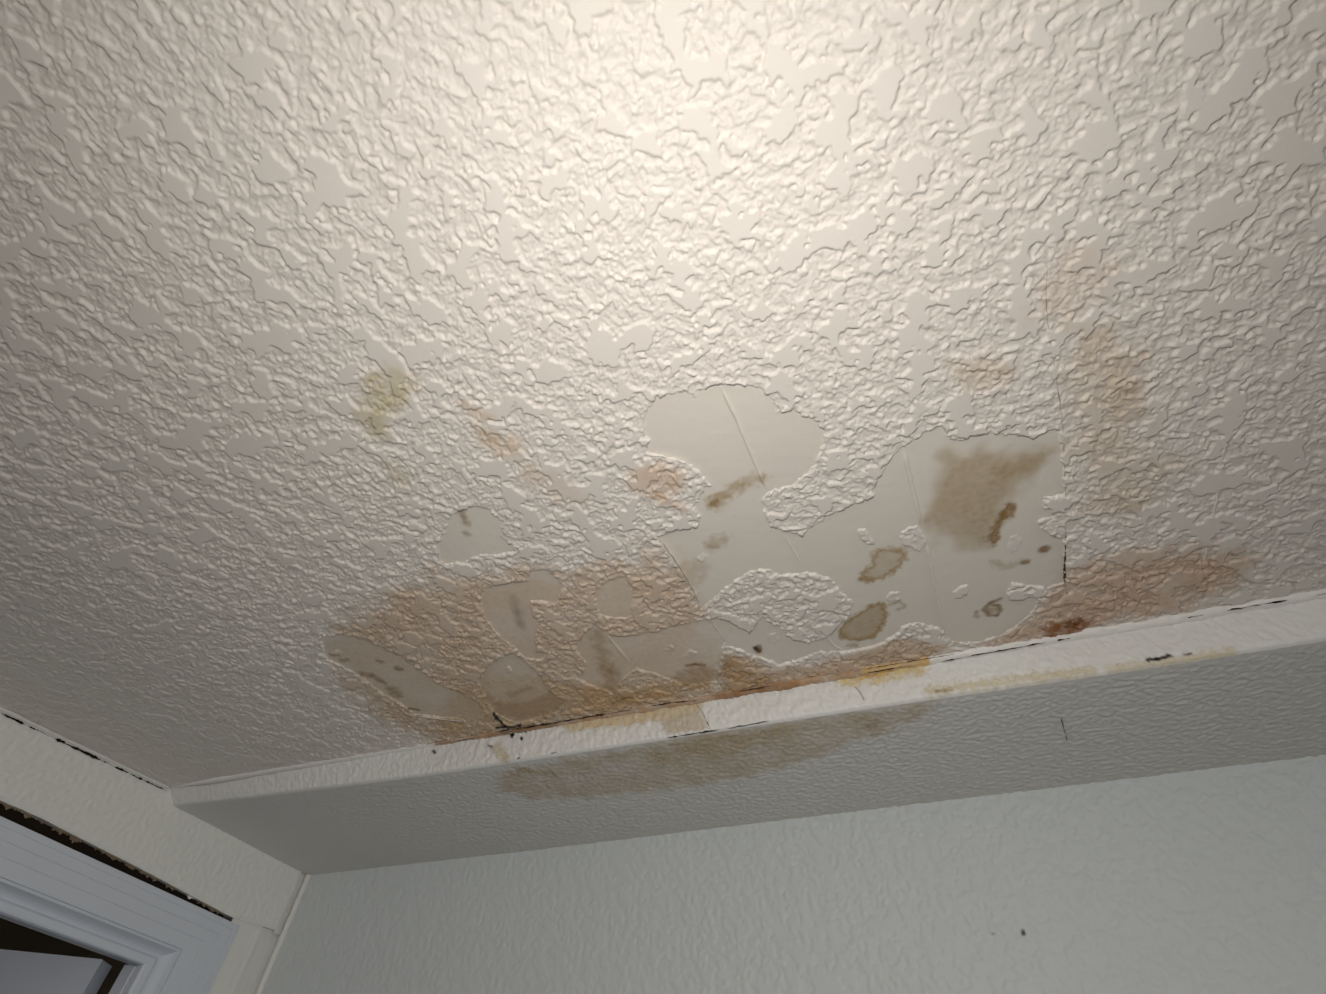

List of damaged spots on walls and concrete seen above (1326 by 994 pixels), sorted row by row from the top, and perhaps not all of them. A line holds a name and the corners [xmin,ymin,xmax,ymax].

peeling [576,384,1080,692]
damp [990,503,1016,543]
damp [839,603,886,641]
damp [724,646,772,691]
damp [438,678,740,758]